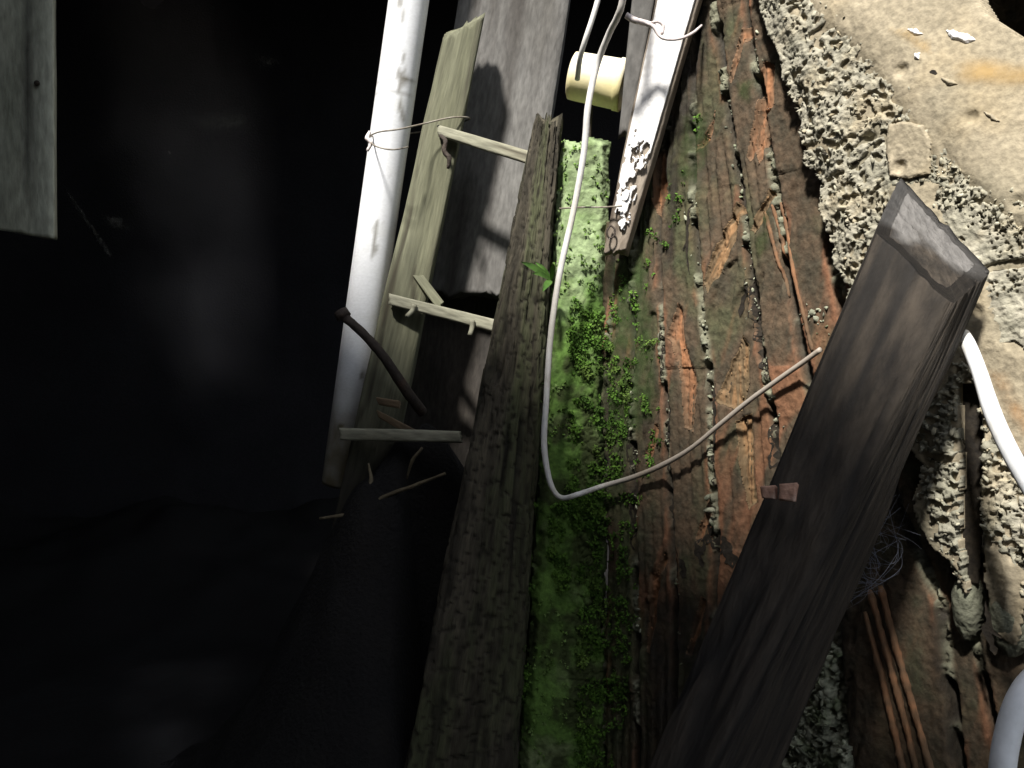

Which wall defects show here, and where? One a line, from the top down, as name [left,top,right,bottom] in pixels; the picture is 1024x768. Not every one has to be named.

peeling [615,0,695,230]
spalling [691,0,1024,351]
spalling [912,354,1024,597]